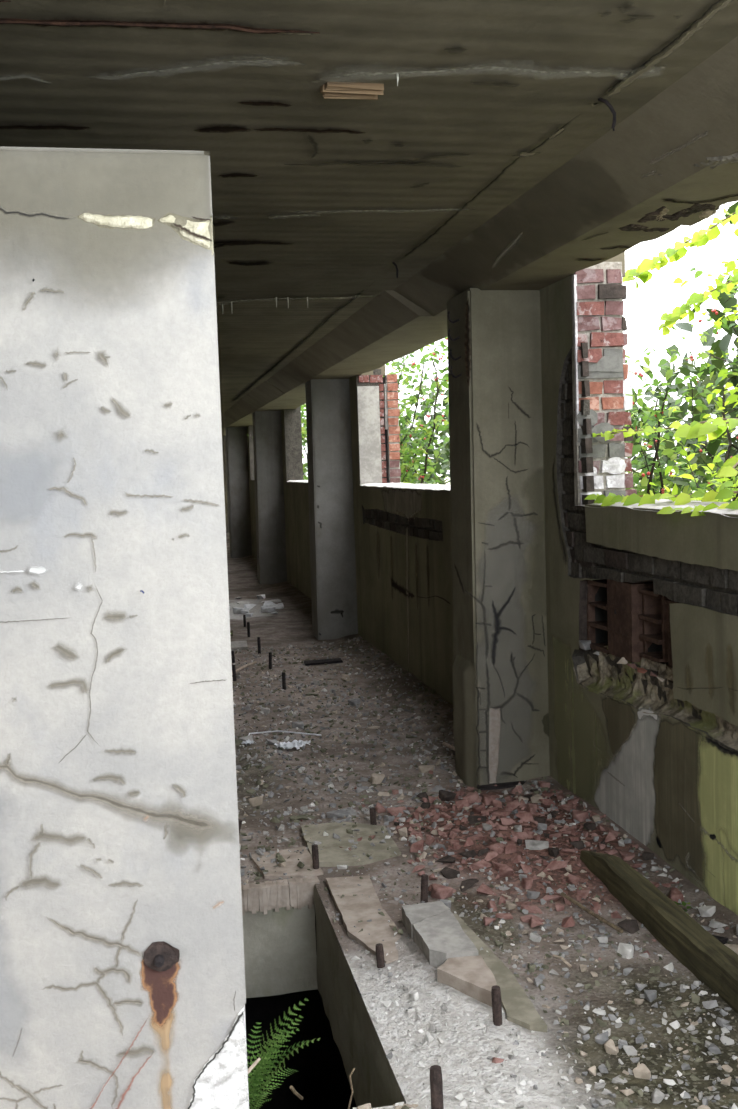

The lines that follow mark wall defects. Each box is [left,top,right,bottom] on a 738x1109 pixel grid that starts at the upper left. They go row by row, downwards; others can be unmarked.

crack [0,208,69,219]
spalling [79,213,290,256]
spalling [618,204,721,232]
crack [126,493,219,506]
flaking render [560,343,738,615]
crack [391,389,567,783]
crack [0,533,217,839]
crack [45,901,143,1034]
crack [0,1029,61,1109]
crack [78,1051,118,1105]
rust [90,959,180,1109]
crack [187,991,243,1109]